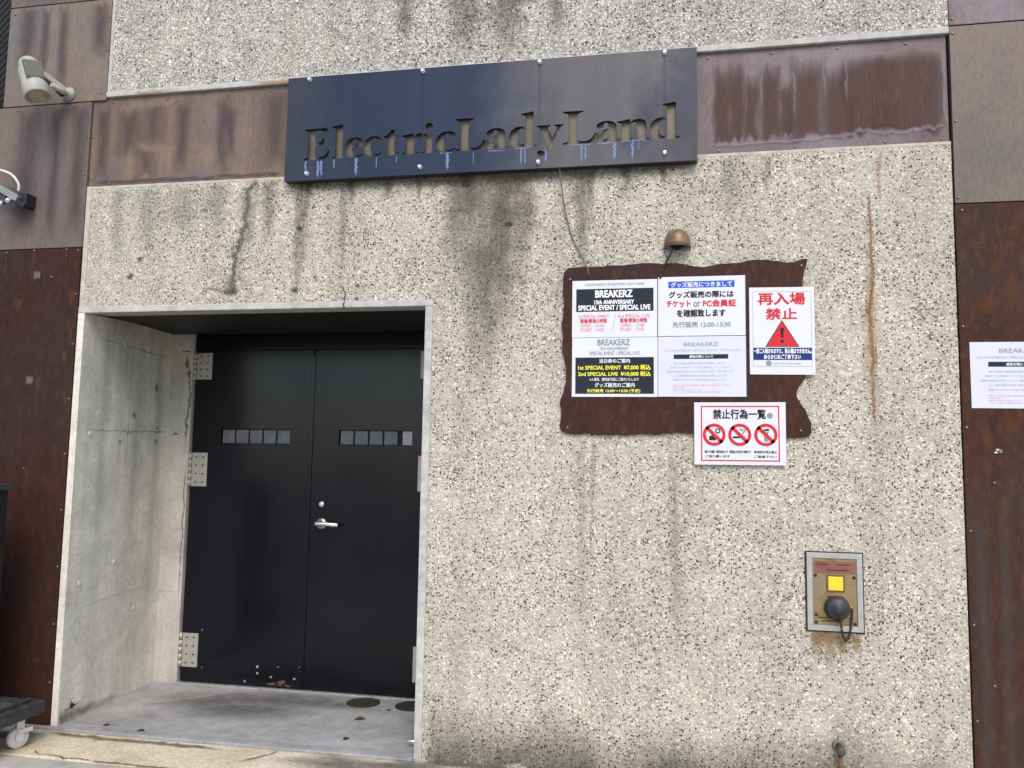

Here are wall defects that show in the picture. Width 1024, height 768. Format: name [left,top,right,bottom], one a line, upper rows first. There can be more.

corrosion [868,198,877,413]